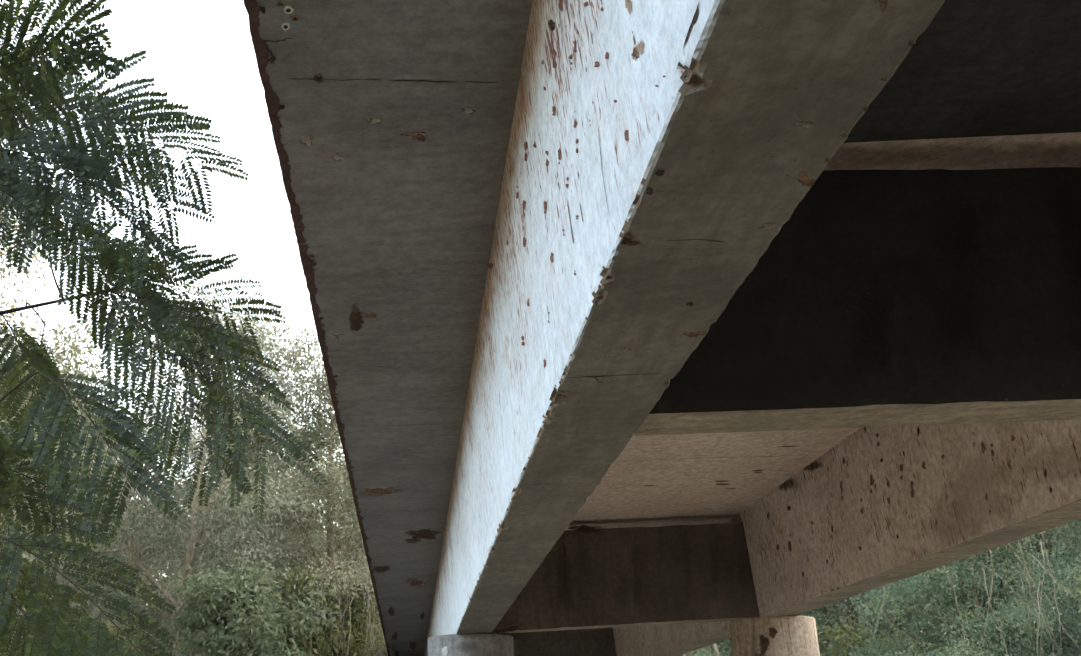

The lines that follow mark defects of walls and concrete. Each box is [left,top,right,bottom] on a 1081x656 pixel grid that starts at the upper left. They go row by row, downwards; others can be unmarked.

corrosion [541,0,603,68]
crack [286,76,499,84]
corrosion [496,133,579,245]
corrosion [243,0,391,656]
spalling [349,305,376,331]
corrosion [860,464,914,513]
spalling [405,529,441,543]